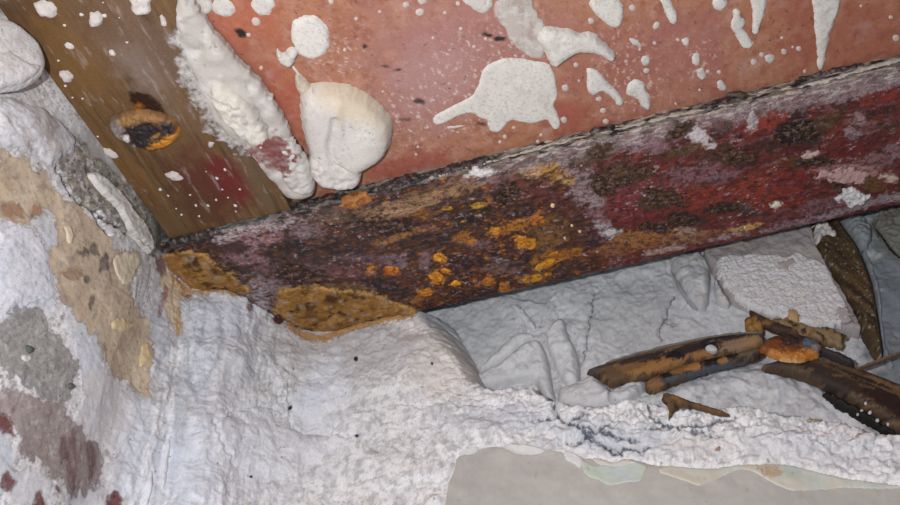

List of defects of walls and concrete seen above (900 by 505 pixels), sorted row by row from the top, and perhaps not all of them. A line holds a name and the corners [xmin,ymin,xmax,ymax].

corrosion [797,63,864,80]
corrosion [130,92,164,113]
corrosion [699,91,748,111]
leakage [248,136,297,178]
corrosion [339,156,490,209]
corrosion [274,197,322,214]
corrosion [514,235,537,250]
spalling [0,134,166,405]
corrosion [158,226,253,336]
corrosion [418,253,461,296]
corrosion [272,284,417,342]
peeling [445,443,900,505]